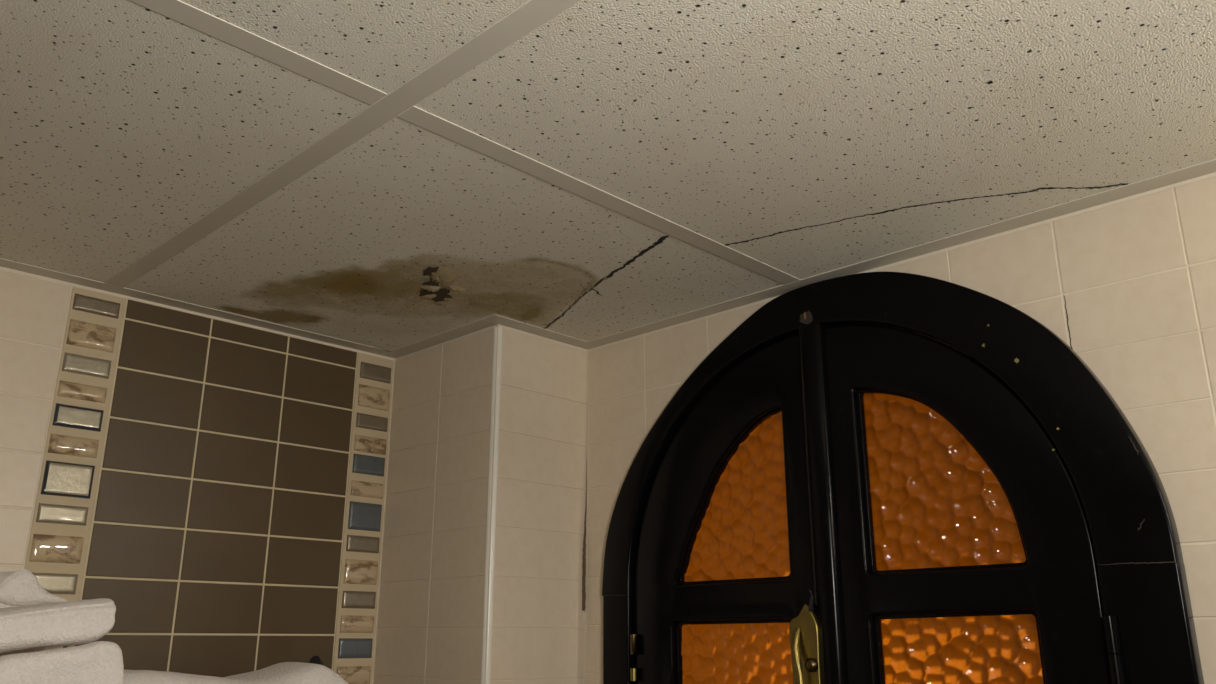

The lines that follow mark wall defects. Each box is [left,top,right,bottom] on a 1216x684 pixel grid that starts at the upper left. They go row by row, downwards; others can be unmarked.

crack [725,183,1128,246]
water stain [222,262,426,323]
crack [543,236,669,329]